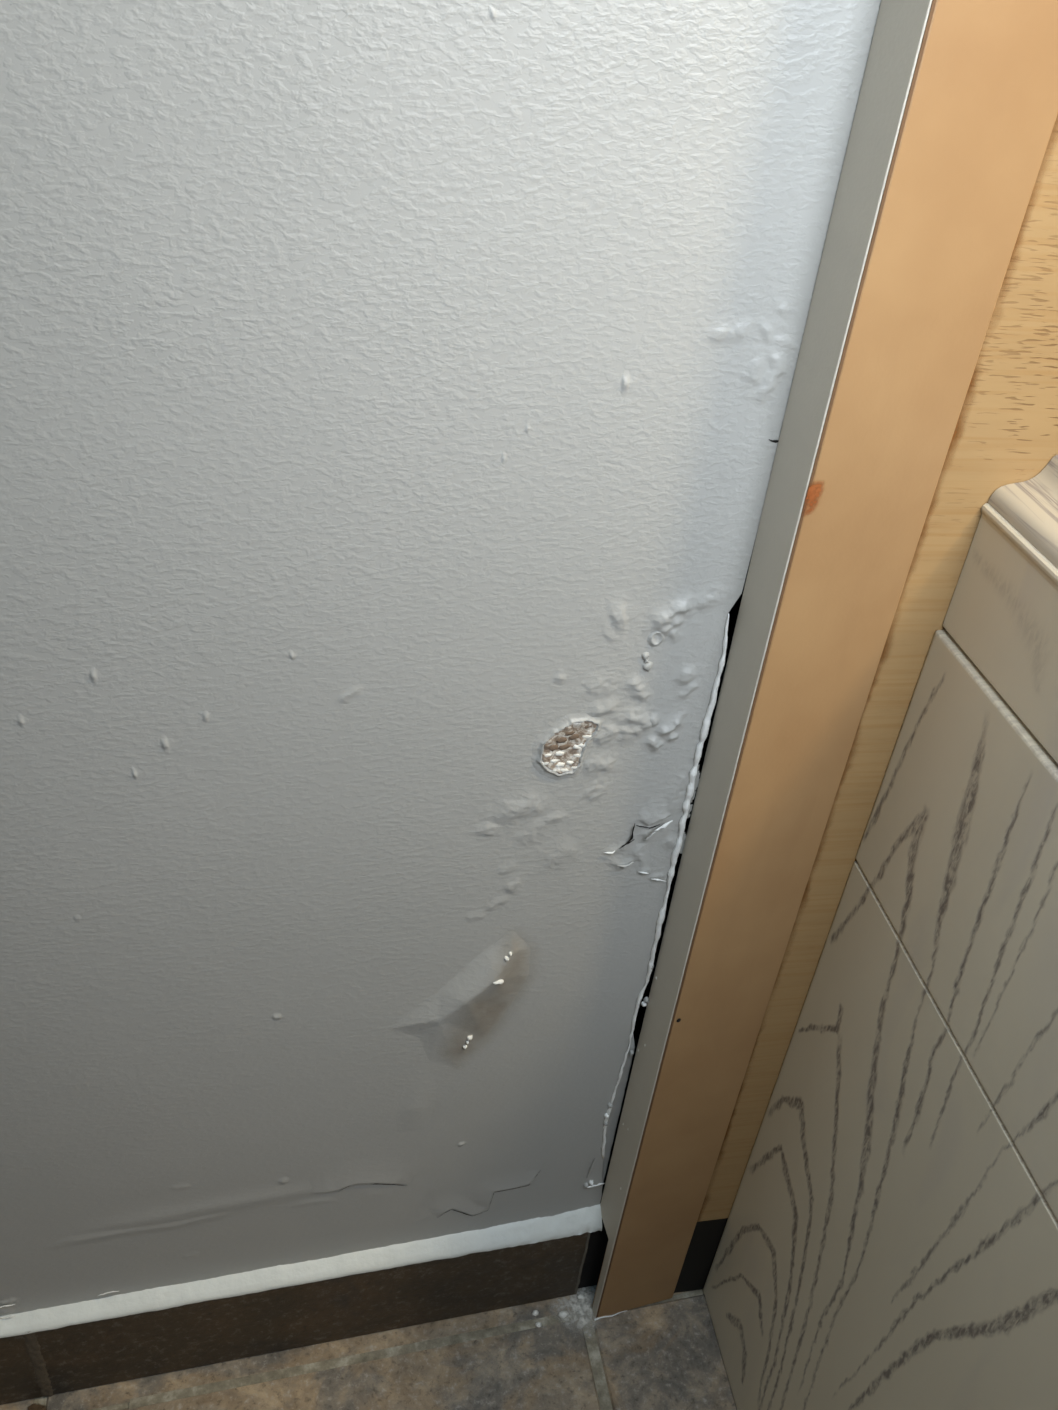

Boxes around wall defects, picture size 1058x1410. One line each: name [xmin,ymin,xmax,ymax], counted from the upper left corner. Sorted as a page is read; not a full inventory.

spalling [531,713,605,781]
crack [584,613,729,1188]